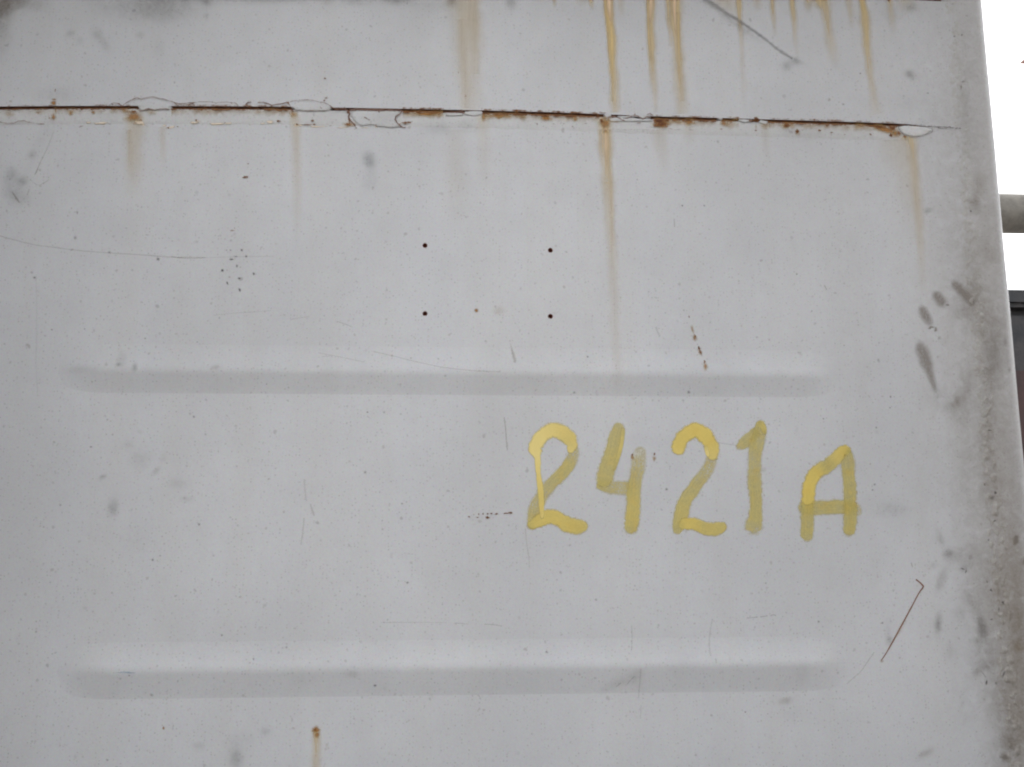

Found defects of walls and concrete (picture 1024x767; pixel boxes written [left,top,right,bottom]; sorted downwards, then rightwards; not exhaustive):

corrosion [860,0,869,52]
corrosion [604,0,616,86]
corrosion [8,89,141,121]
corrosion [171,102,316,125]
corrosion [402,107,444,124]
corrosion [482,109,609,153]
corrosion [653,115,906,137]